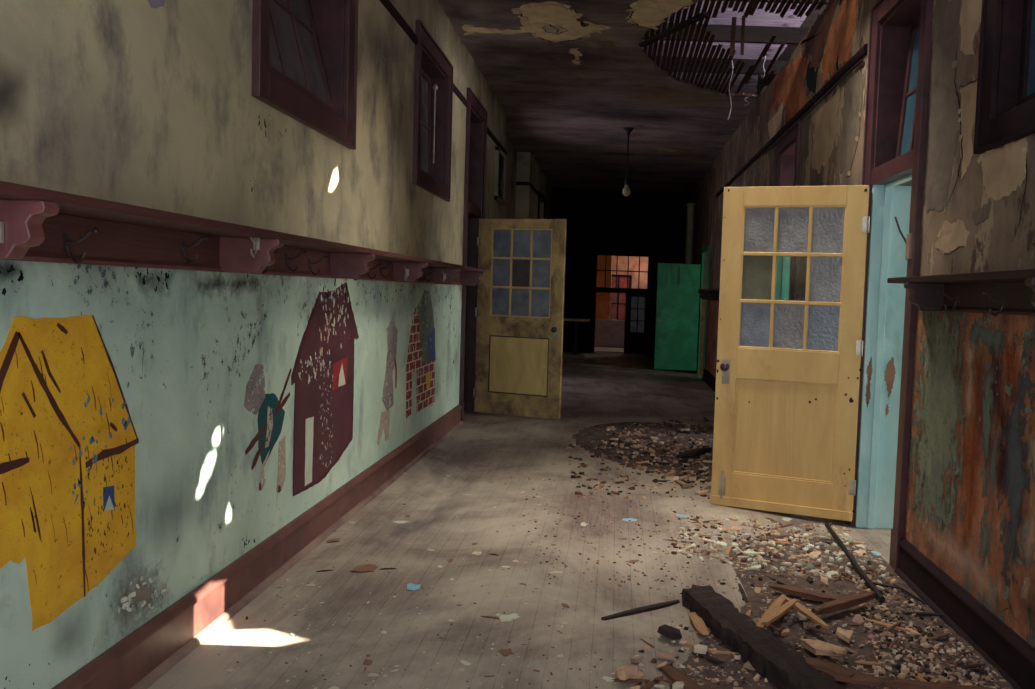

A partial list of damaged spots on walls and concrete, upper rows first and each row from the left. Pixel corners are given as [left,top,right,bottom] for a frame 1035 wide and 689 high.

peeling [462,1,611,65]
peeling [625,0,693,30]
flaking render [768,0,863,177]
flaking render [927,0,1028,254]
peeling [845,356,896,416]
peeling [908,310,1035,599]